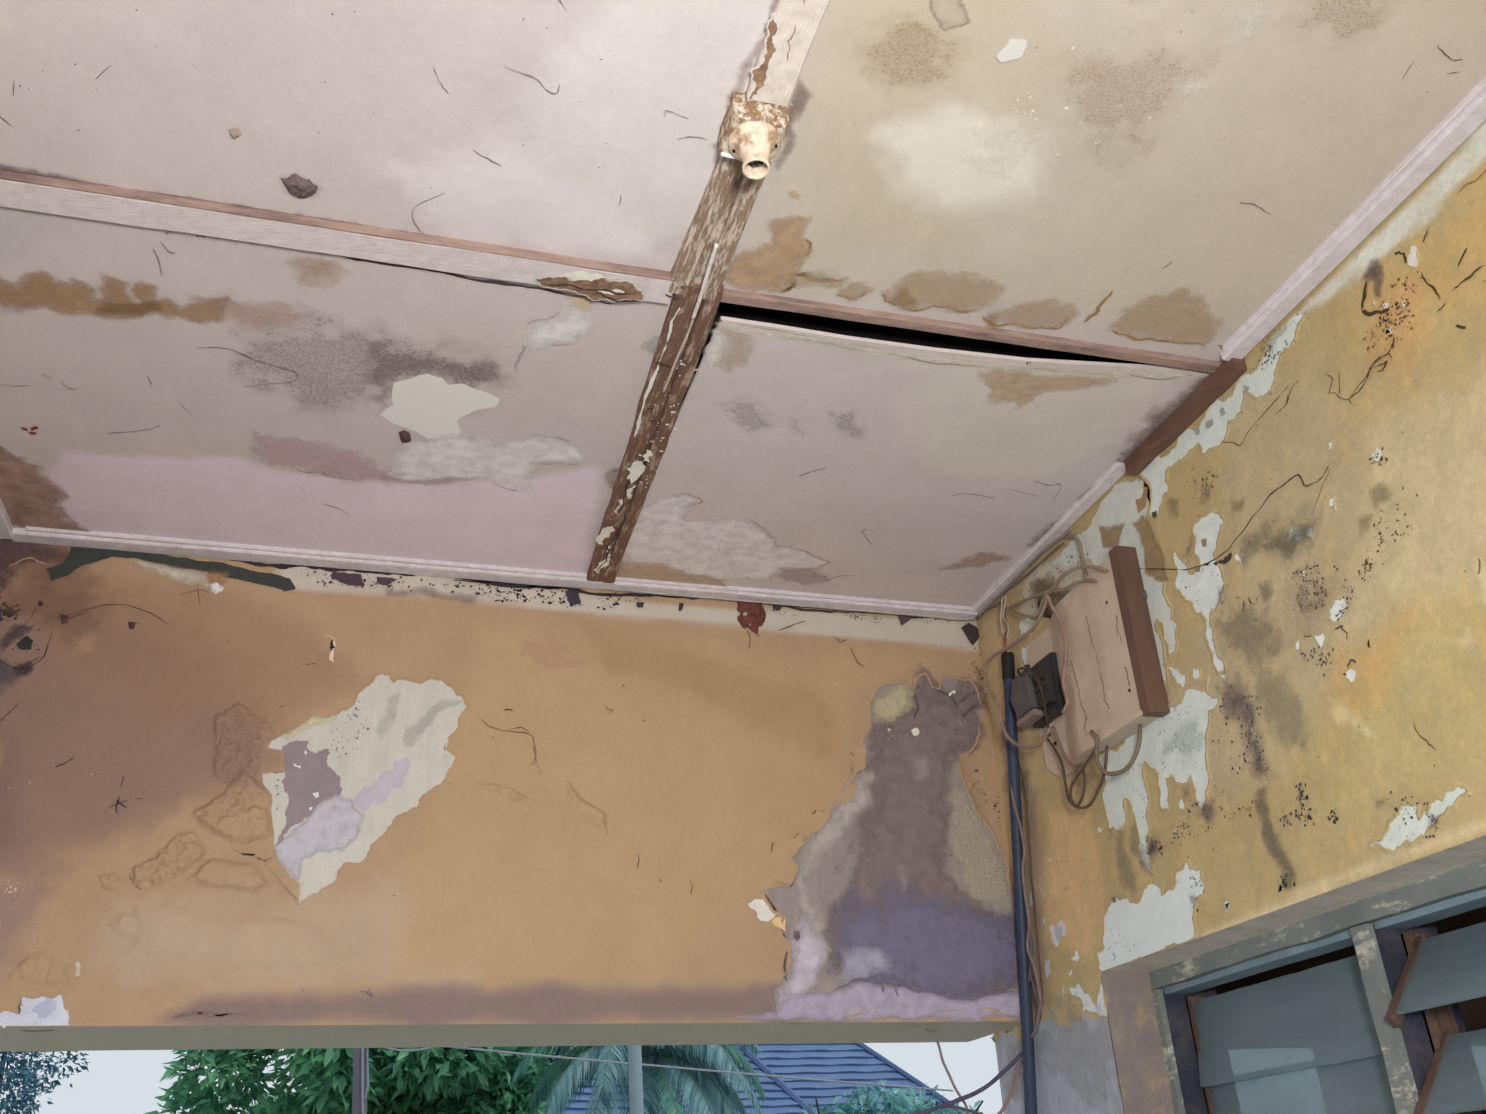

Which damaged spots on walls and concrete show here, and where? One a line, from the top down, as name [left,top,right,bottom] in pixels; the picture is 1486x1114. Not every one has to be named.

crack [312,251,610,304]
peeling [534,271,645,303]
leakage [258,435,585,490]
peeling [380,374,500,439]
peeling [593,294,1207,573]
leakage [0,447,830,689]
peeling [990,307,1309,1114]
peeling [260,672,470,906]
peeling [1366,781,1473,856]